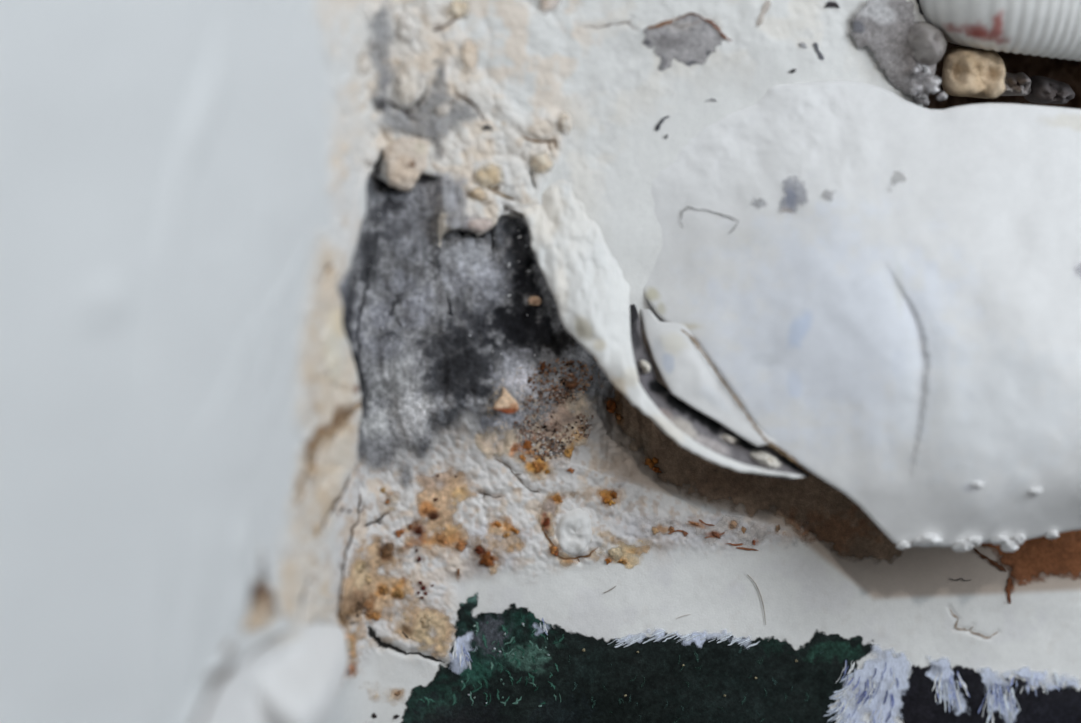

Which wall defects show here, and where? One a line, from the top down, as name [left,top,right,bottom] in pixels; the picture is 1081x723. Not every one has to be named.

spalling [643,12,733,71]
flaking render [382,137,429,191]
peeling [321,165,374,517]
water stain [337,158,615,468]
rust [476,356,902,569]
crack [322,475,389,615]
rust [973,530,1081,604]